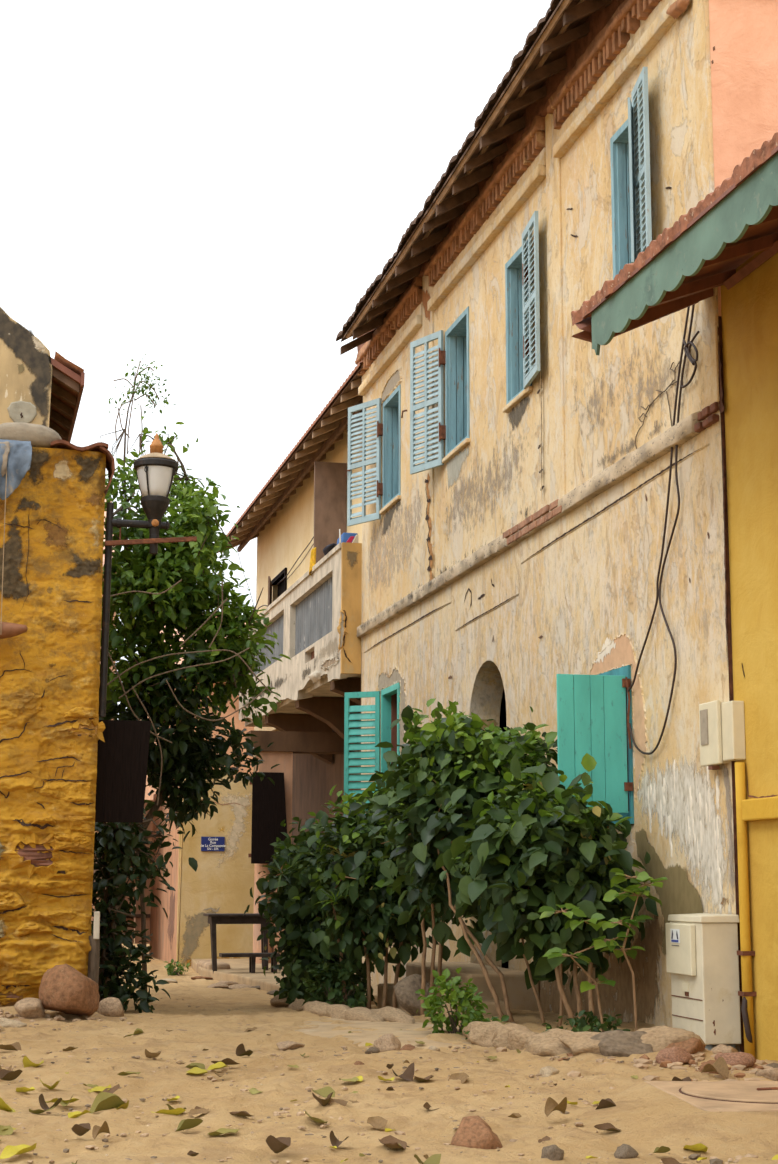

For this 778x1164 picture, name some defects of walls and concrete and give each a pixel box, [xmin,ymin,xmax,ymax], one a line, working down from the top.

crack [536,352,544,500]
crack [716,326,724,414]
crack [340,444,745,678]
spalling [0,832,63,879]
crack [0,653,95,938]
crack [52,926,86,942]
damp [539,829,703,1023]
peeling [589,632,732,914]